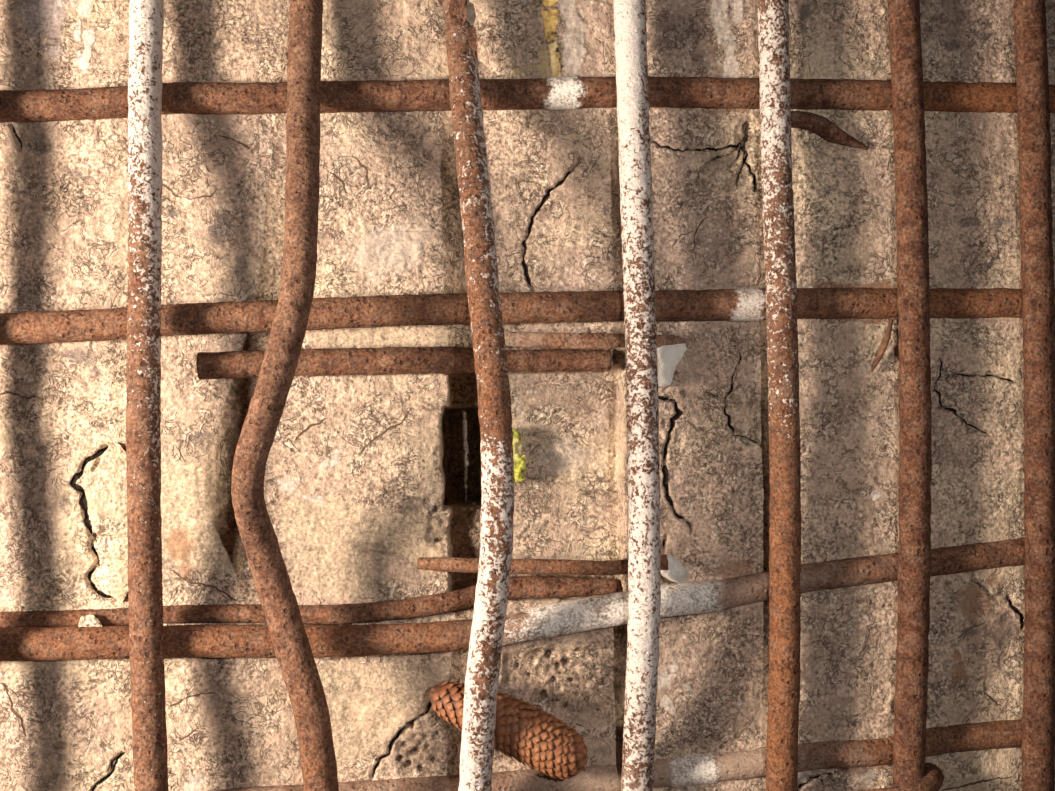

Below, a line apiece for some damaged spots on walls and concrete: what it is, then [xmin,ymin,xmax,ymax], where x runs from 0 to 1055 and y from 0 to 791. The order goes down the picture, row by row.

crack [522,161,581,287]
crack [650,135,756,190]
crack [70,447,114,599]
spalling [0,0,628,791]
crack [658,396,691,531]
crack [706,348,761,446]
spalling [502,0,1055,791]
crack [933,357,1017,433]